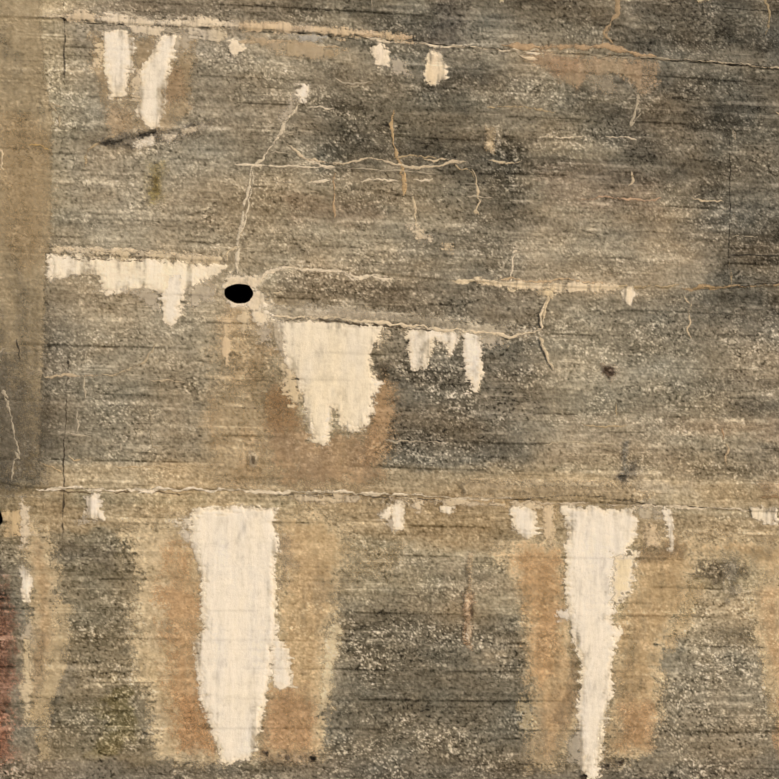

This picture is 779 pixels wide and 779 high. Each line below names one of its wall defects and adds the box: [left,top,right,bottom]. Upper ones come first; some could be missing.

crack [335,77,371,85]
crack [41,0,779,77]
water stain [423,51,450,86]
crack [606,80,642,140]
crack [48,105,493,274]
water stain [0,0,424,549]
crack [257,131,779,369]
water stain [474,277,638,306]
water stain [403,327,501,396]
water stain [20,569,34,603]
efflorescence [175,504,298,766]
efflorescence [436,498,675,779]